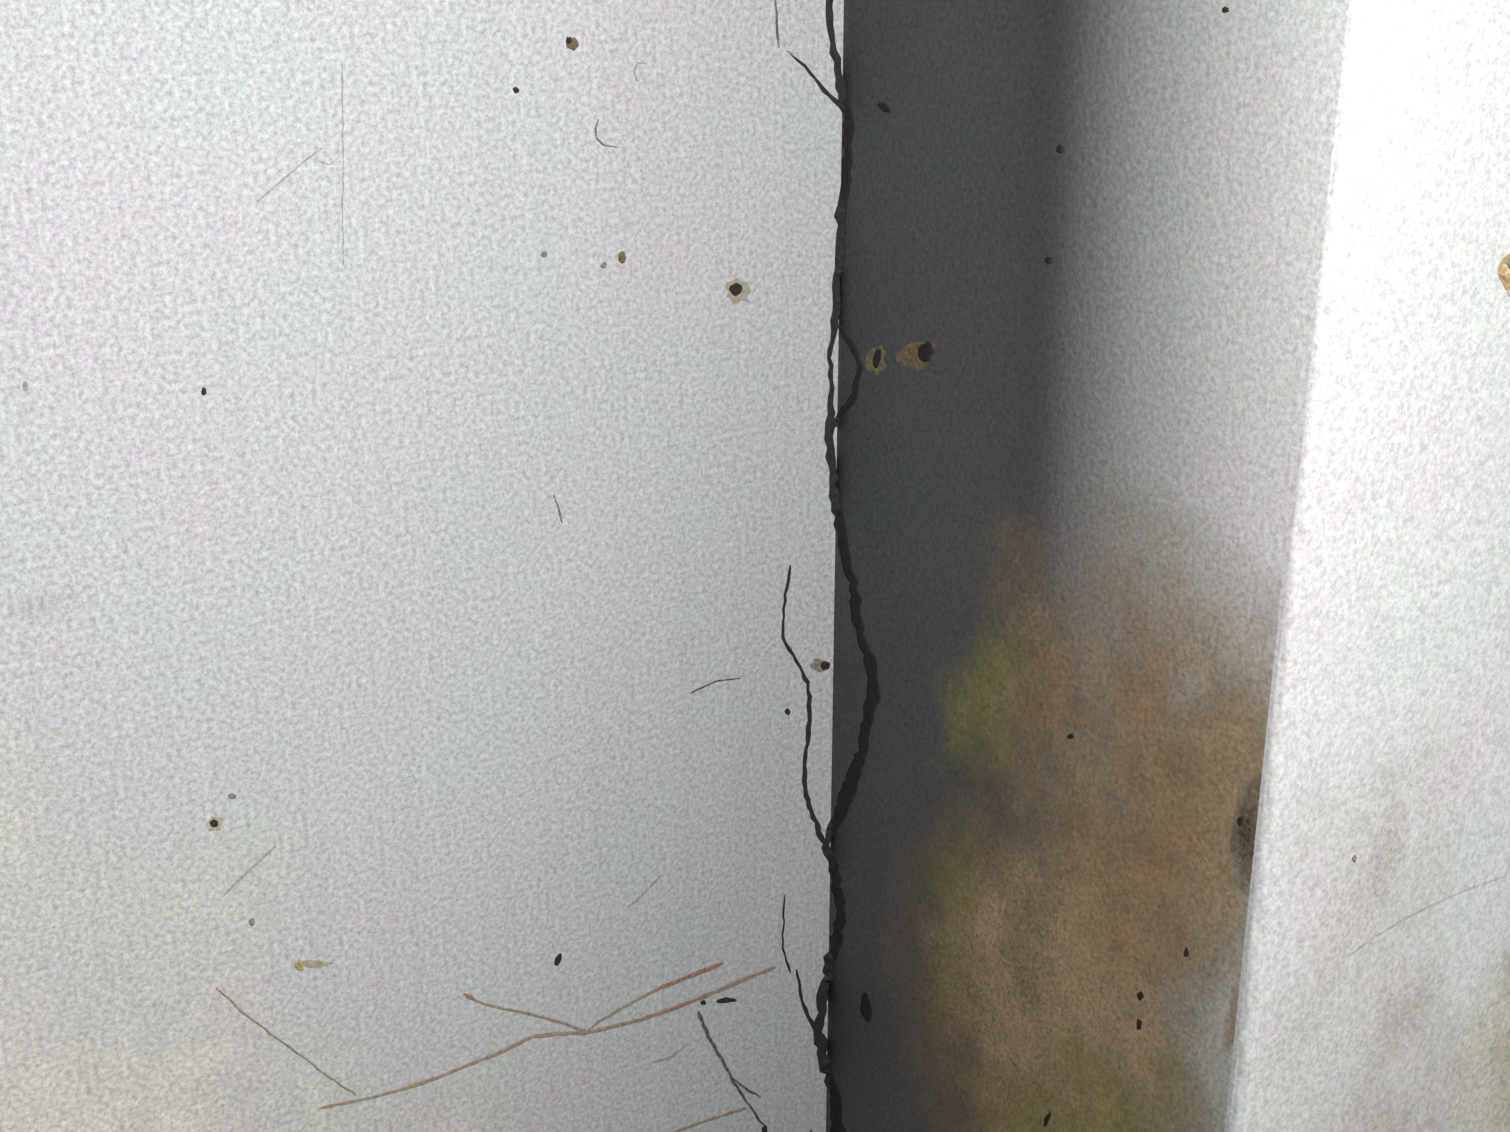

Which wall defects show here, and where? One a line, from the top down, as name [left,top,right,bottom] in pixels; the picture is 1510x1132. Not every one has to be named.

crack [216,0,881,1132]
leakage [920,602,1266,1132]